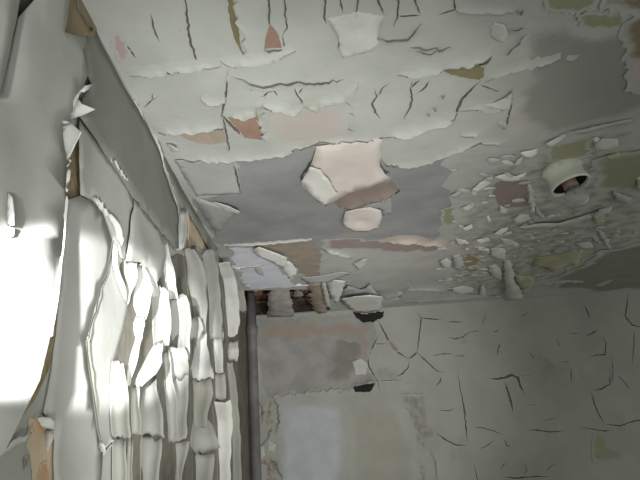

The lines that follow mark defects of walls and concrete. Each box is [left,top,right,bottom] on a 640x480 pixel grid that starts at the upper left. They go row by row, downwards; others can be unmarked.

spalling [398,3,640,148]
peeling [488,148,538,166]
peeling [592,136,621,160]
spalling [0,0,508,480]
peeling [465,238,584,301]
peeling [456,172,620,253]
crack [367,313,557,480]
crack [528,418,563,433]
crack [556,305,640,432]
crack [624,294,640,363]